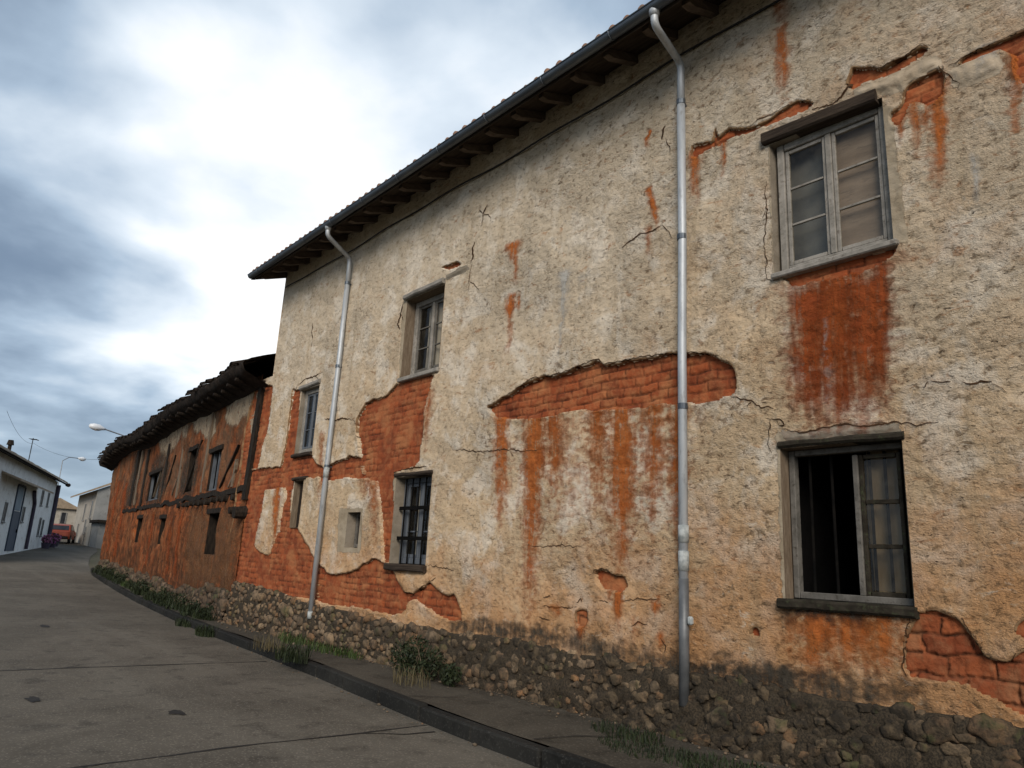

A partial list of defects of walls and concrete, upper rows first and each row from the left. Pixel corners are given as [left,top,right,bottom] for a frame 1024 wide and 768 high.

peeling [846,45,928,89]
peeling [690,100,813,157]
crack [622,225,672,248]
peeling [159,375,462,621]
crack [452,446,548,454]
rust [524,413,561,586]
peeling [487,352,737,419]
rust [590,404,636,559]
rust [646,404,678,529]
crack [734,396,937,453]
rust [788,263,889,414]
peeling [903,608,1024,715]